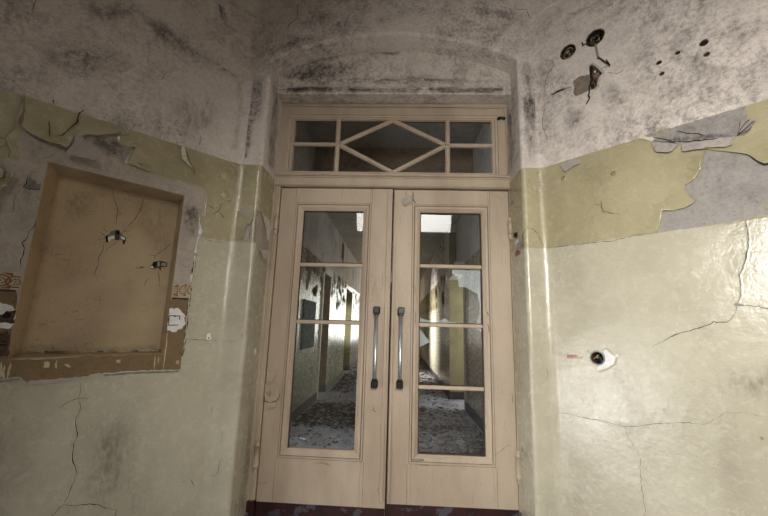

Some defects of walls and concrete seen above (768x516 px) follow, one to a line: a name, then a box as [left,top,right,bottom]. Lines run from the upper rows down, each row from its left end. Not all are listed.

peeling [0,92,208,384]
peeling [235,204,270,259]
peeling [638,106,768,233]
crack [658,220,768,344]
crack [52,387,117,516]
crack [565,412,764,514]